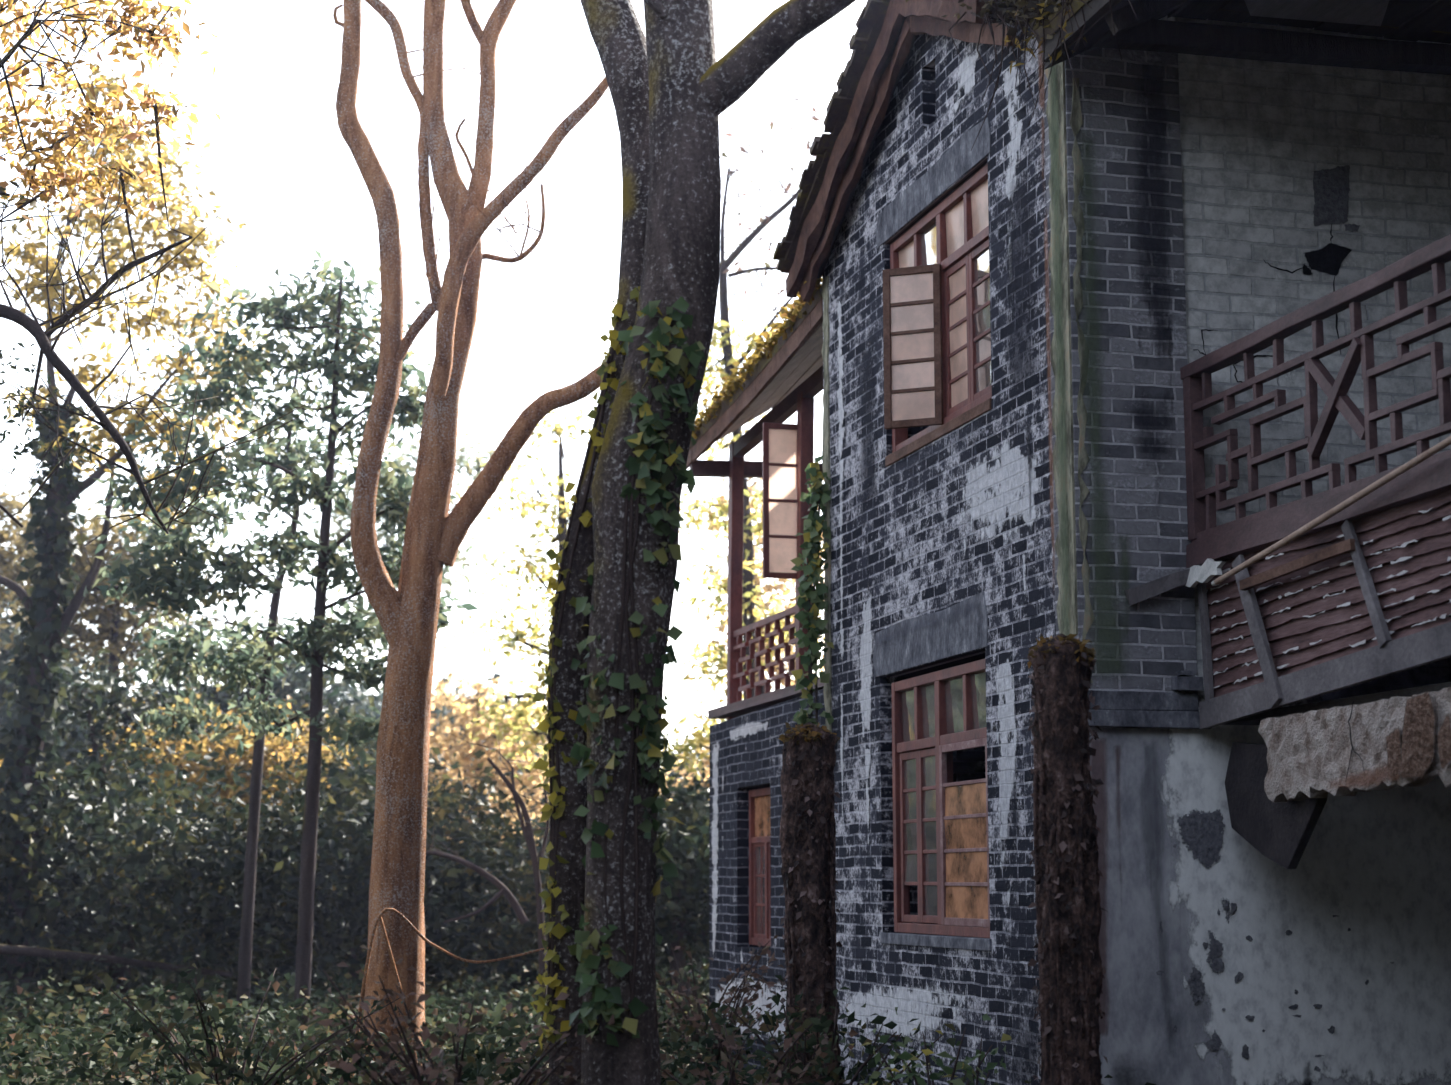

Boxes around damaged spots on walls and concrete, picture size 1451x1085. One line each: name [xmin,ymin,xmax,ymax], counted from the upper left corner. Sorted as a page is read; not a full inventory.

leakage [1008,183,1036,385]
leakage [861,346,875,501]
leakage [1134,397,1167,458]
peeling [1198,539,1451,711]
peeling [1160,692,1451,1085]